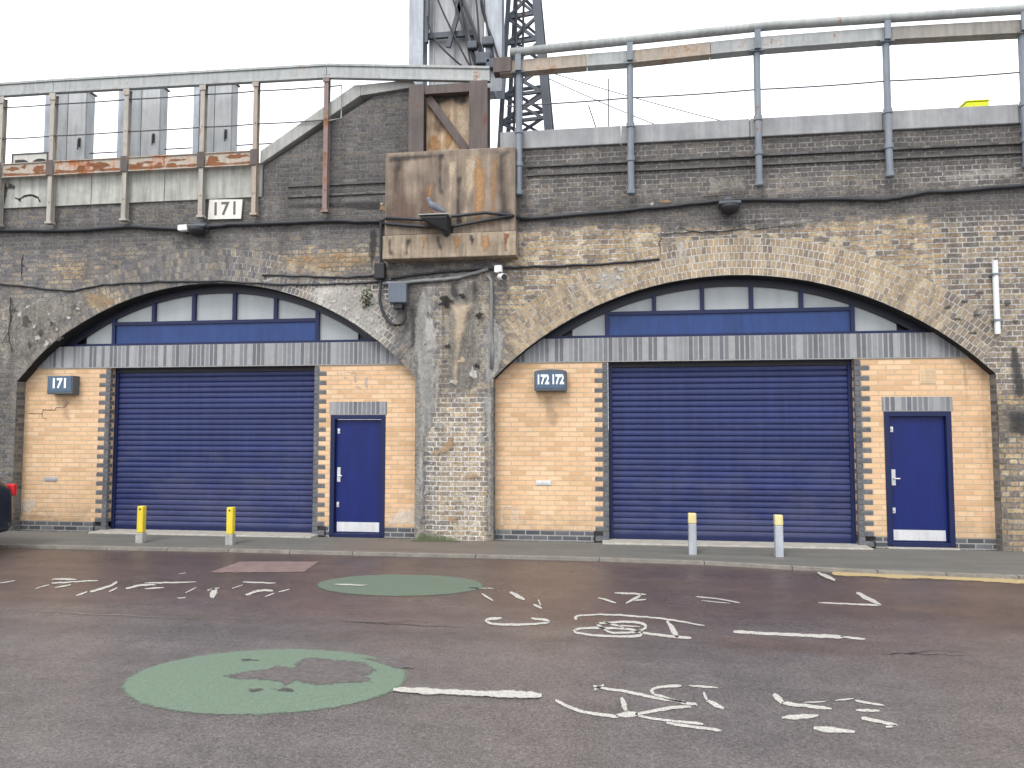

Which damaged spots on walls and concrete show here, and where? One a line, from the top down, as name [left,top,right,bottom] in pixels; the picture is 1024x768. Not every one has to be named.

rust [3,153,250,176]
rust [449,157,496,222]
water stain [411,281,476,349]